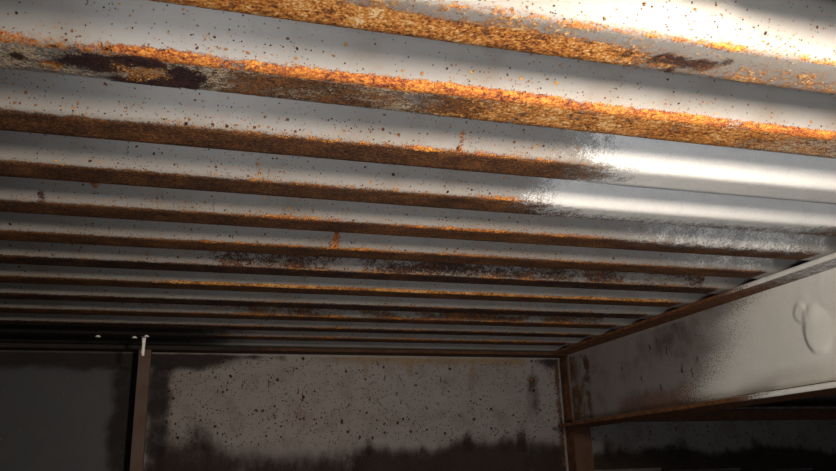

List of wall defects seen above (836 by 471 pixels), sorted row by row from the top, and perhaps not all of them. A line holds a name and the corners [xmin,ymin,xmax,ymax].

rust [0,0,836,346]
water stain [155,429,566,471]
rust [145,350,602,471]